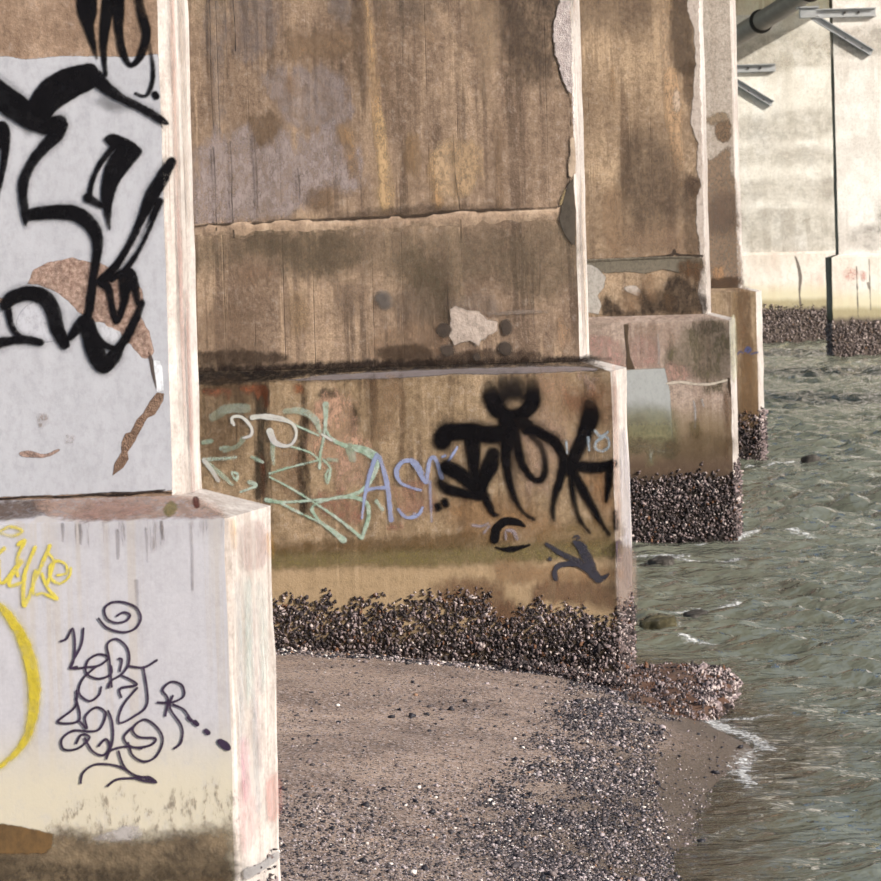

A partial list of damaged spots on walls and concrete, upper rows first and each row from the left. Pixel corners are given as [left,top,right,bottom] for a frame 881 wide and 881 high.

crack [209,0,236,97]
peeling [553,0,576,177]
crack [195,122,559,239]
water stain [603,0,758,427]
peeling [687,0,744,314]
spalling [17,302,56,342]
spalling [28,257,164,475]
water stain [627,413,678,455]
water stain [0,828,240,881]